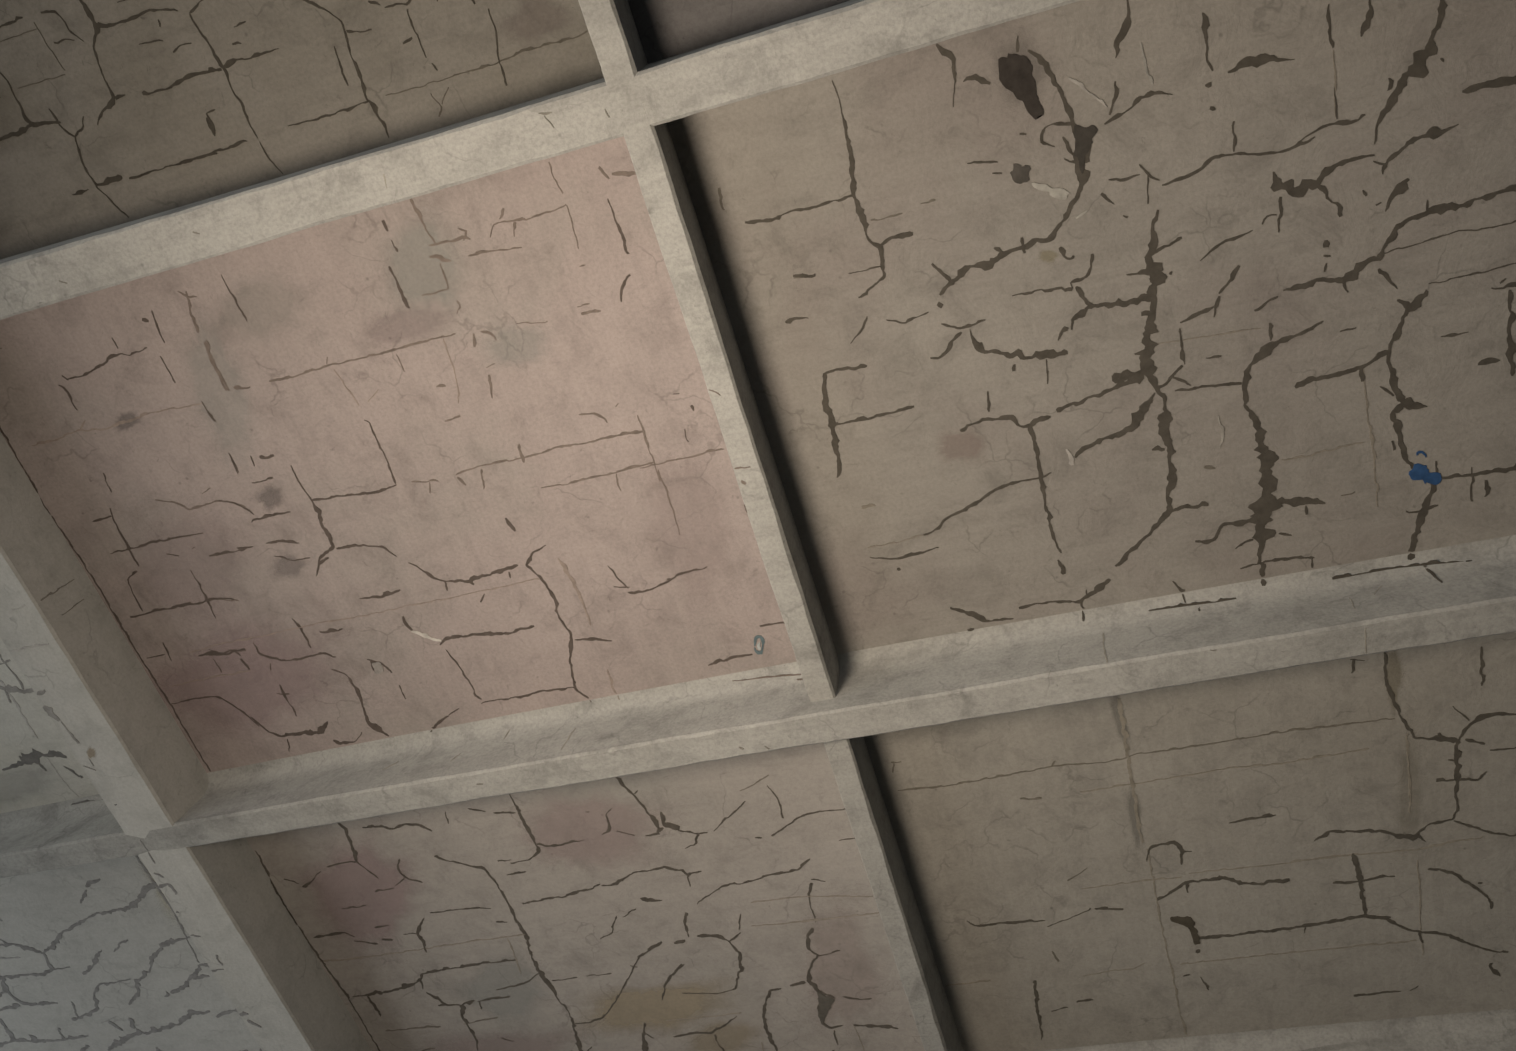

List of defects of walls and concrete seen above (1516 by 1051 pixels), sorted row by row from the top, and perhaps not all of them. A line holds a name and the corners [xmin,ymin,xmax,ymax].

crack [0,0,588,218]
spalling [998,54,1044,120]
crack [0,112,898,1051]